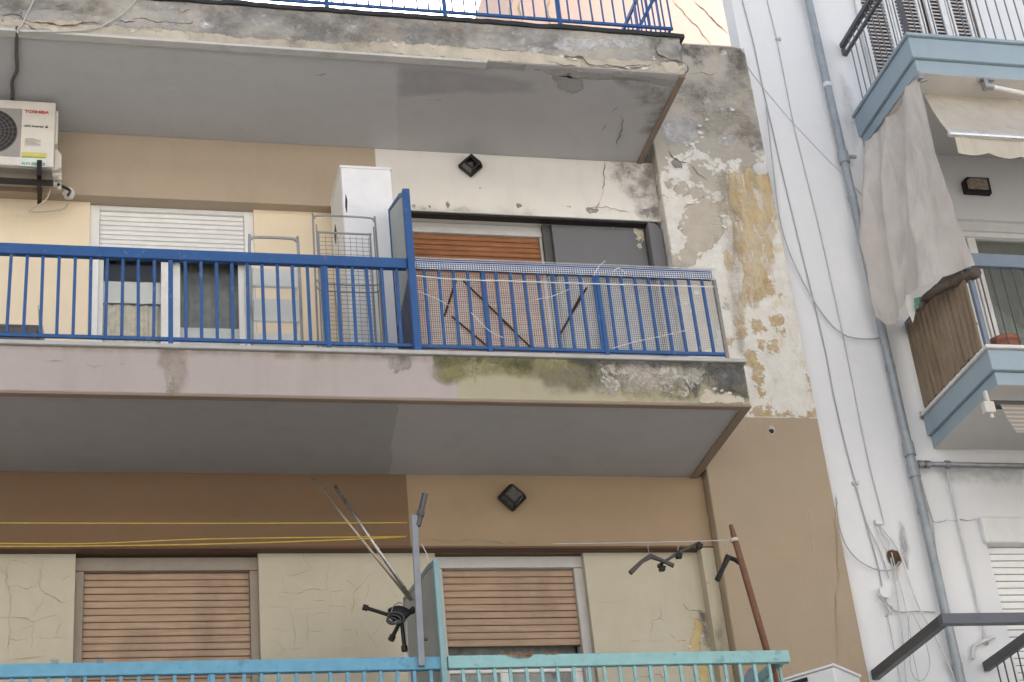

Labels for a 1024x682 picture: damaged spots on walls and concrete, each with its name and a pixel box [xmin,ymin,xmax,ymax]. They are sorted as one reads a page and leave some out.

crack [6,4,193,30]
spalling [368,37,685,94]
crack [541,0,728,75]
crack [587,107,630,213]
peeling [613,106,816,435]
leakage [435,356,534,376]
leakage [569,359,749,398]
crack [0,556,71,661]